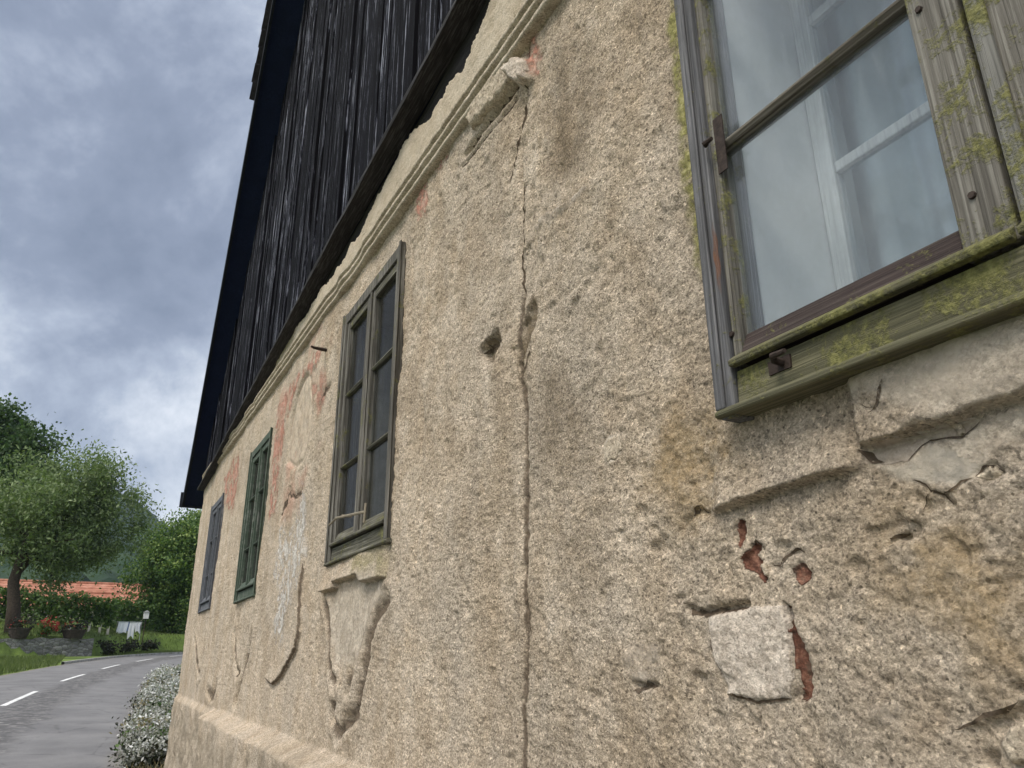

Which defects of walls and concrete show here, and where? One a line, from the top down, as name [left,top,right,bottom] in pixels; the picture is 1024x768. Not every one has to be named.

spalling [464,57,529,166]
spalling [484,333,502,360]
crack [859,379,882,413]
crack [509,85,532,768]
crack [914,477,974,510]
flaking render [737,519,770,583]
flaking render [793,563,812,585]